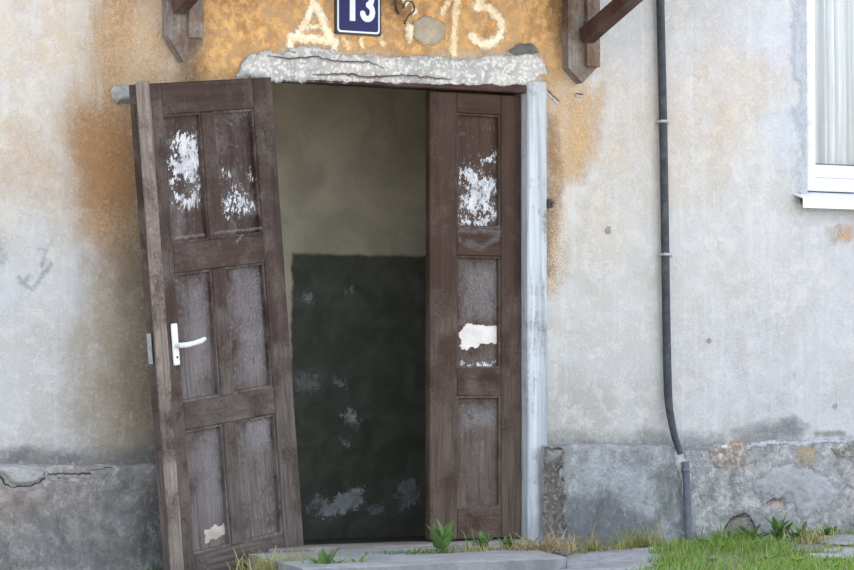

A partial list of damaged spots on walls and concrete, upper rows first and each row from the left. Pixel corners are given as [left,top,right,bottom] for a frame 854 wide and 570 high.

crack [267,55,452,81]
corrosion [75,0,170,271]
spalling [708,440,748,471]
spalling [0,466,43,485]
crack [0,467,114,492]
spalling [542,447,567,543]
spalling [724,512,755,535]